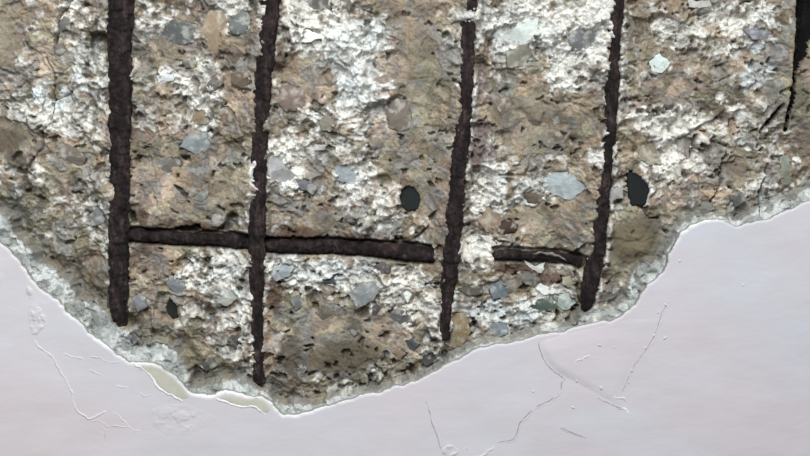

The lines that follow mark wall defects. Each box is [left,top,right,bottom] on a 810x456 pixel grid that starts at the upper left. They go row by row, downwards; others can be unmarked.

crack [759,0,810,132]
corrosion [471,119,496,165]
spalling [0,0,273,401]
corrosion [163,221,216,232]
corrosion [268,280,287,309]
spalling [0,240,558,417]
corrosion [265,227,326,240]
corrosion [342,235,379,243]
spalling [120,0,810,415]
corrosion [495,251,566,283]
crack [498,342,565,444]
crack [599,304,669,410]